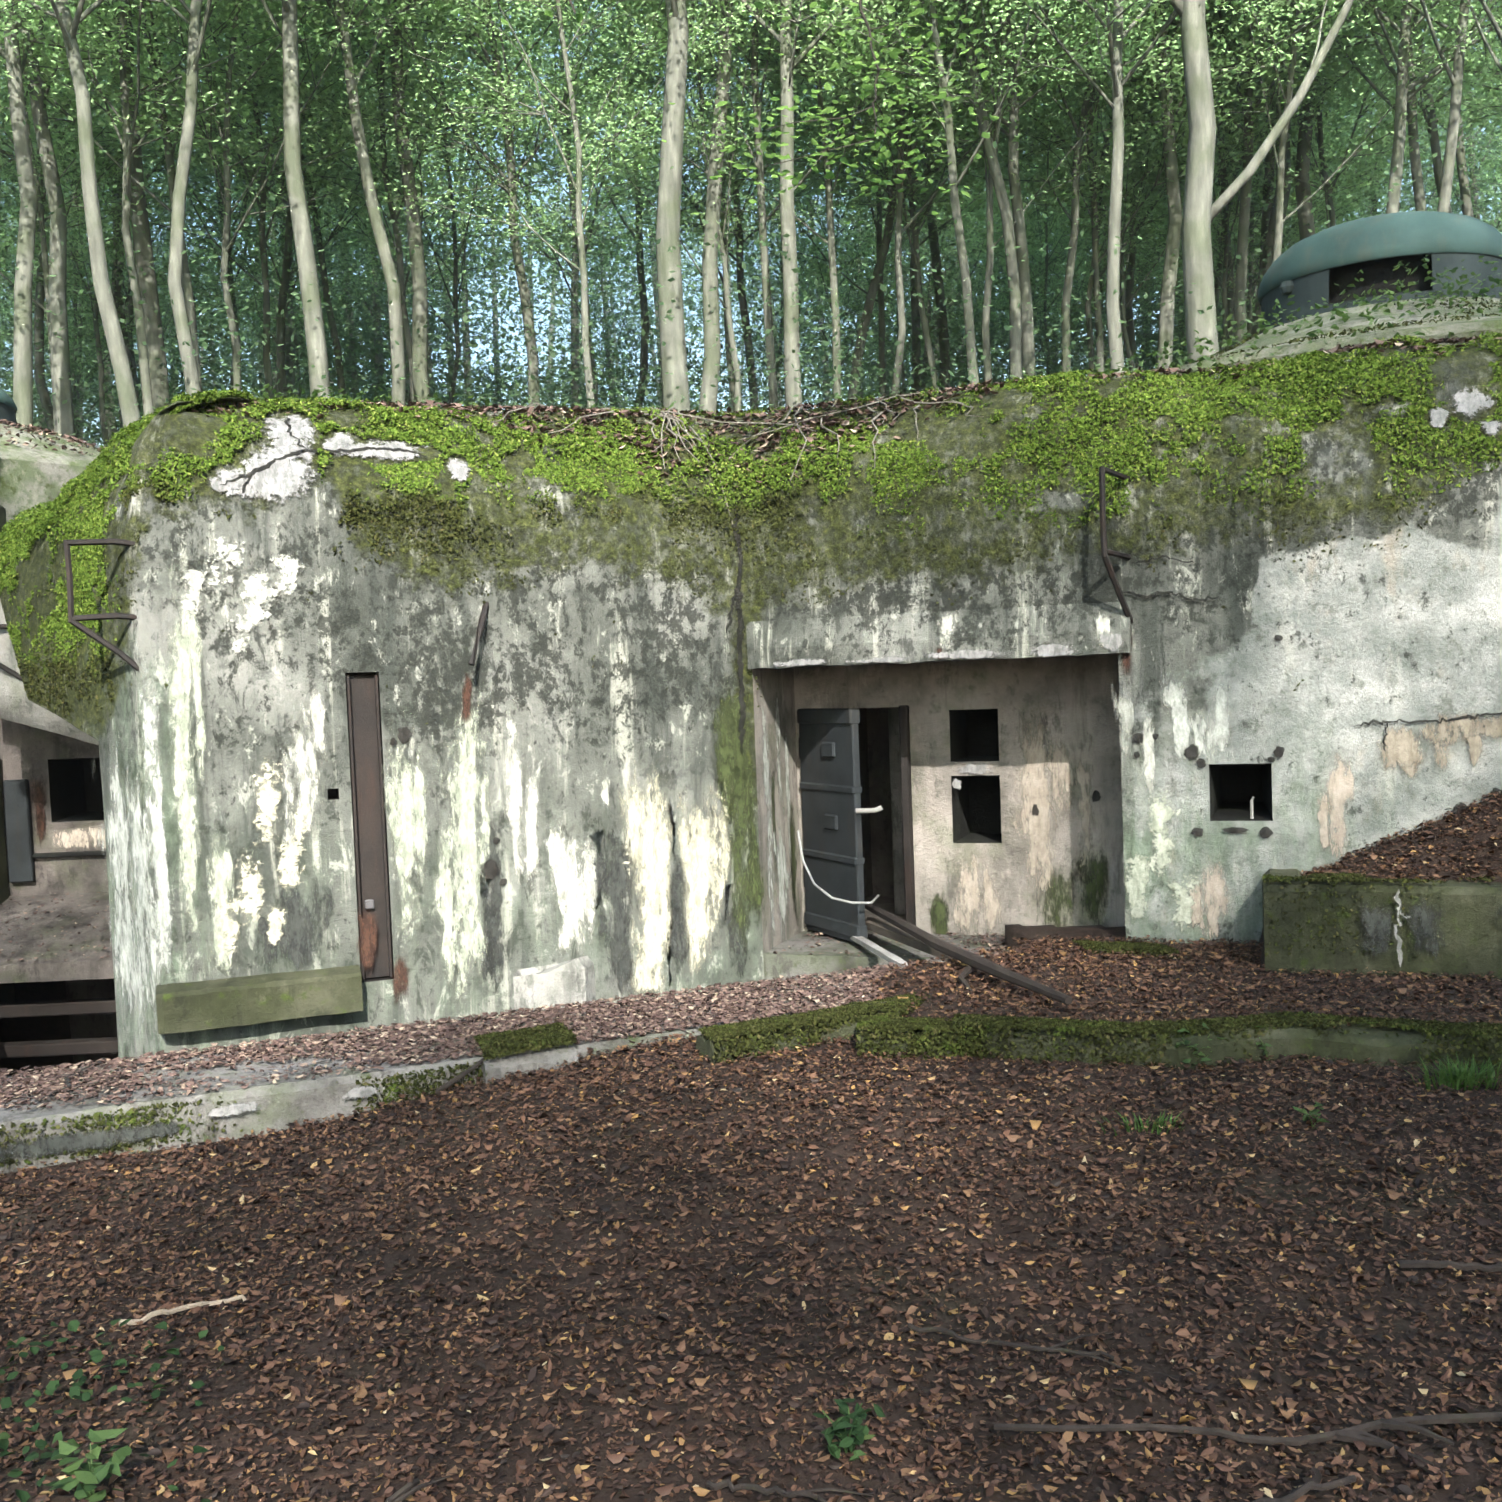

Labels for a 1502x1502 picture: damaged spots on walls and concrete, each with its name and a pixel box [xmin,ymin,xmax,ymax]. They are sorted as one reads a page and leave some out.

spalling [1430,386,1502,435]
spalling [209,415,428,504]
spalling [447,458,470,482]
crack [1123,555,1219,602]
crack [1353,712,1502,751]
leakage [53,607,234,1027]
leakage [255,692,334,970]
leakage [385,673,797,998]
rust [357,912,378,969]
crack [1393,889,1411,967]
rust [393,958,408,1003]